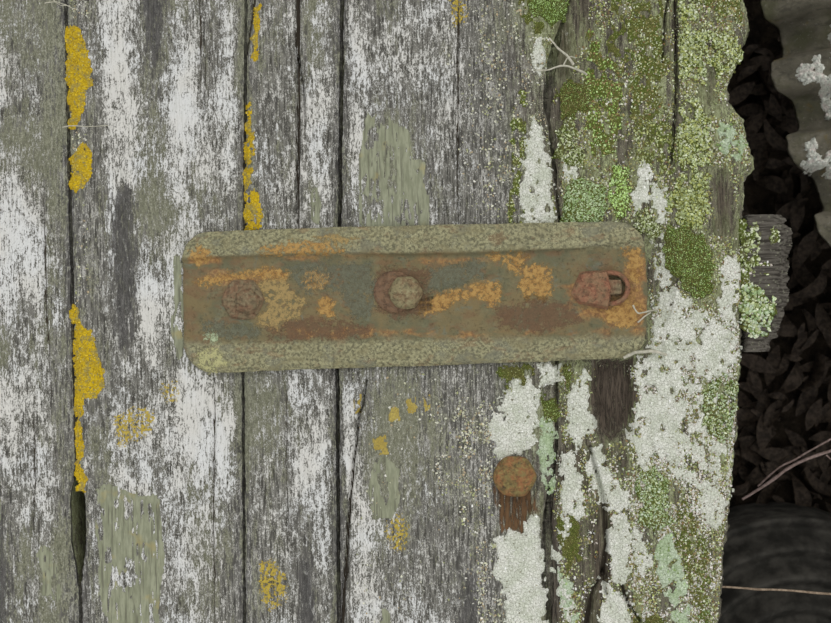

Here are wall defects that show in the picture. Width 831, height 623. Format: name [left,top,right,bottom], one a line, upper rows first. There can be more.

peeling [358,111,431,227]
rust [189,230,374,343]
rust [374,265,503,320]
rust [485,250,554,304]
rust [600,246,645,330]
peeling [95,484,165,623]
crack [342,380,367,623]
rust [493,486,539,534]